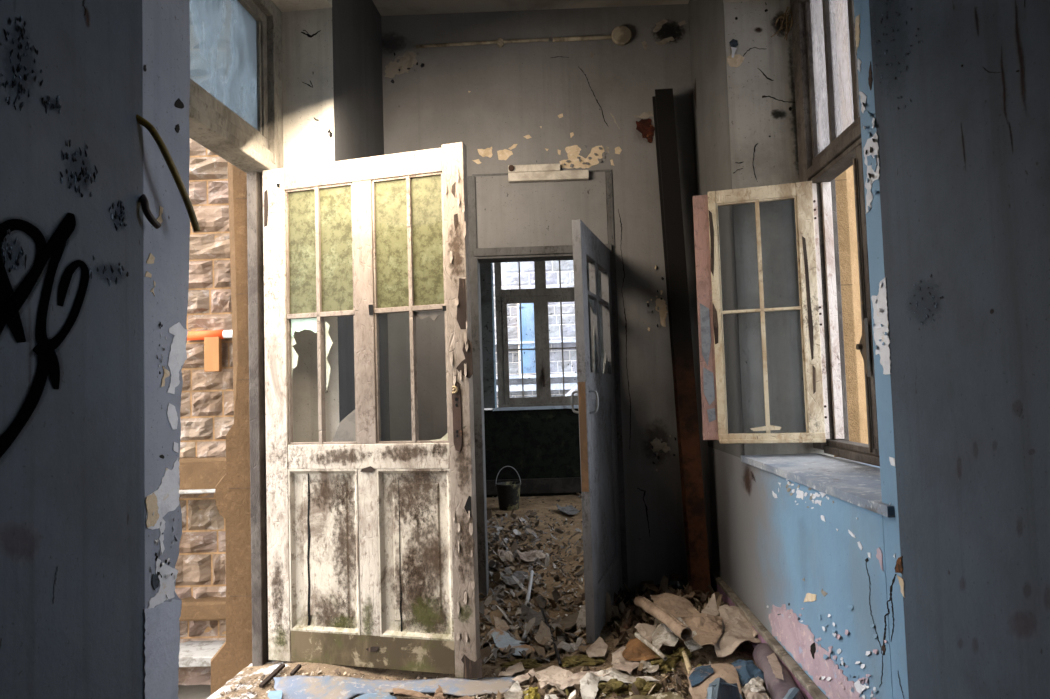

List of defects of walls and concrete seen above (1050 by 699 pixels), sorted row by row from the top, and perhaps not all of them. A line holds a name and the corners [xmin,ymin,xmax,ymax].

peeling [473,135,532,164]
peeling [546,132,622,168]
peeling [855,14,880,214]
peeling [143,322,188,699]
peeling [772,479,834,522]
spalling [836,529,905,598]
peeling [767,578,887,699]
crack [866,562,904,698]